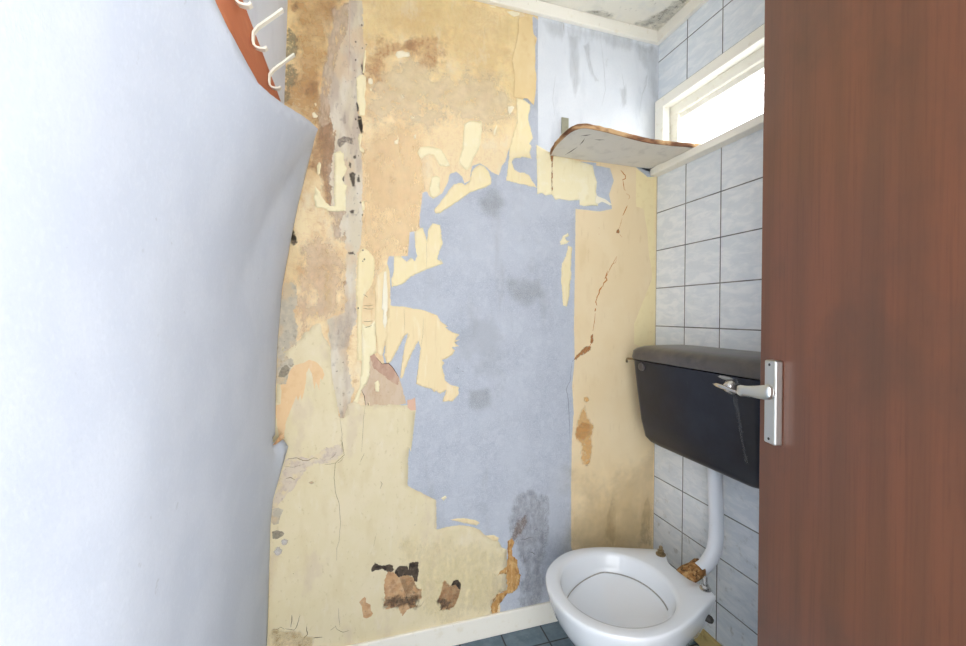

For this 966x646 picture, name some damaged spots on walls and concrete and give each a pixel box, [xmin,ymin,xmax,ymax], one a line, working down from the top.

peeling [506,11,537,188]
peeling [267,0,507,646]
leakage [576,397,593,464]
corrosion [491,538,521,614]